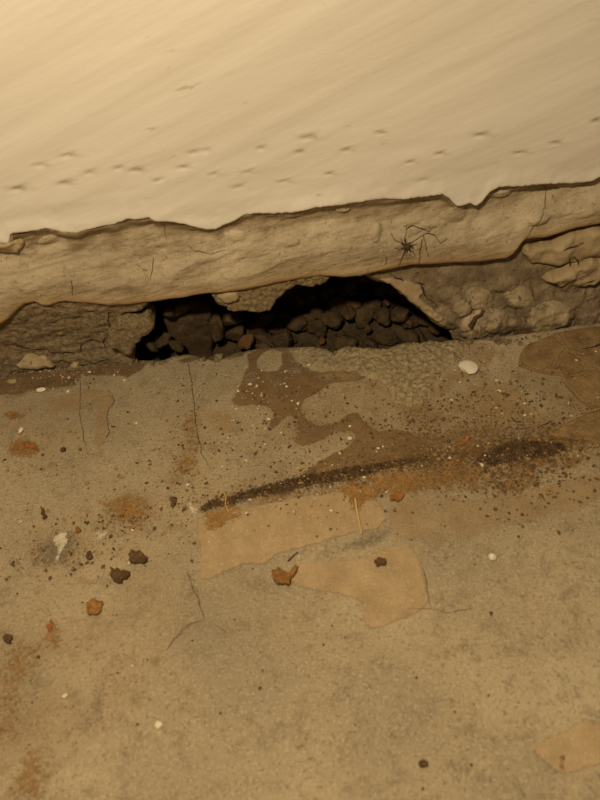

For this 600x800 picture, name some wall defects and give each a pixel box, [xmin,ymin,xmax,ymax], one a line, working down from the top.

peeling [0,177,600,376]
damp [207,348,553,483]